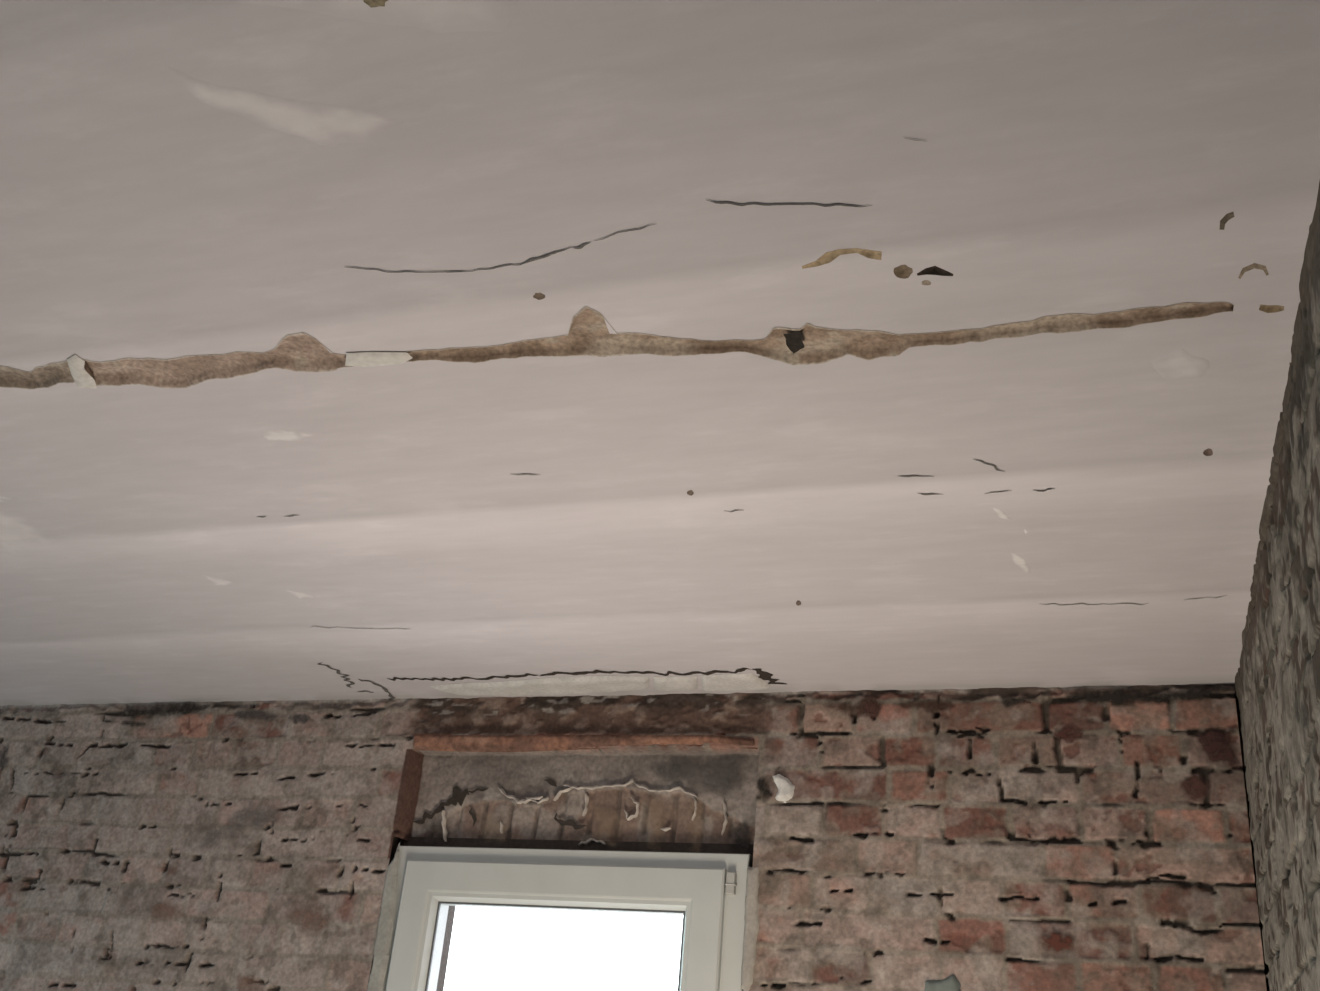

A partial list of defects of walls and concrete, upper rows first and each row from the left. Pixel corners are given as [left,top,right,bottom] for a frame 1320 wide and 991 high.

crack [346,224,655,273]
flaking render [498,778,698,821]